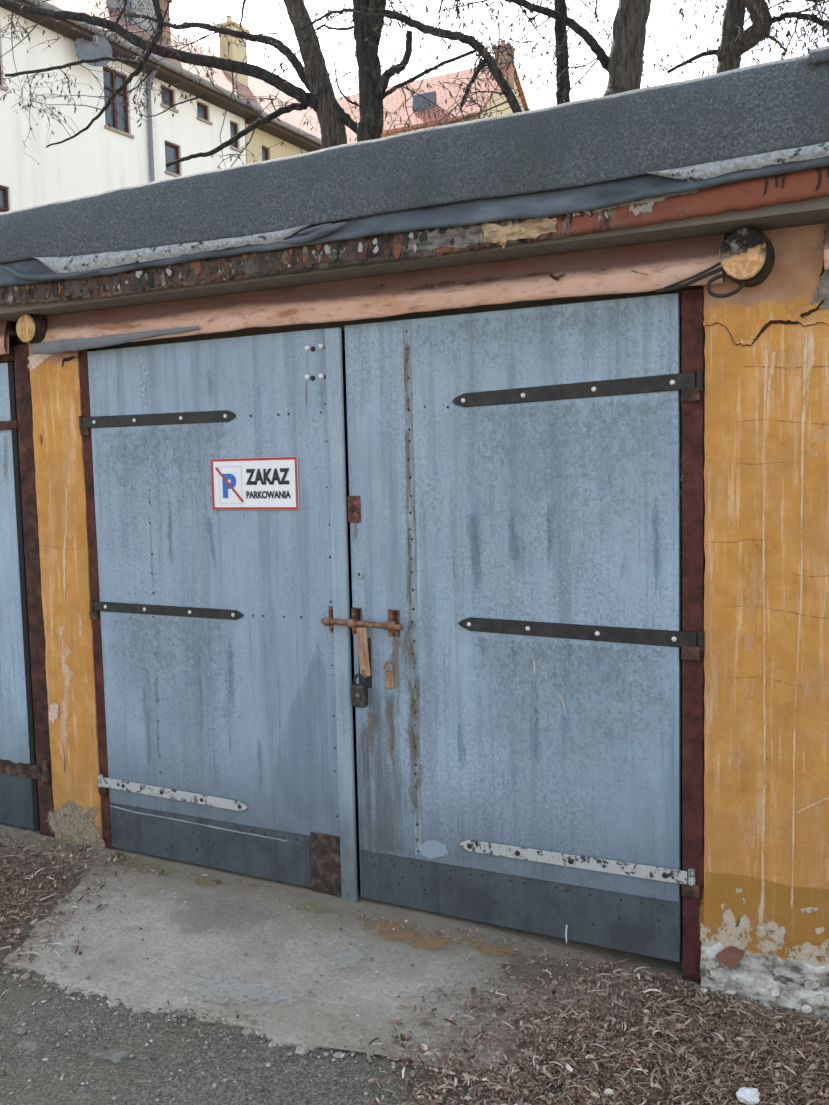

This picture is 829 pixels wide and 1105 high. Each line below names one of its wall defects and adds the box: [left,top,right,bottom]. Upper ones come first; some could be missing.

peeling [0,190,700,304]
crack [703,231,829,346]
flaking render [810,270,829,309]
water stain [801,334,816,528]
peeling [48,801,105,849]
flaking render [700,887,829,1020]